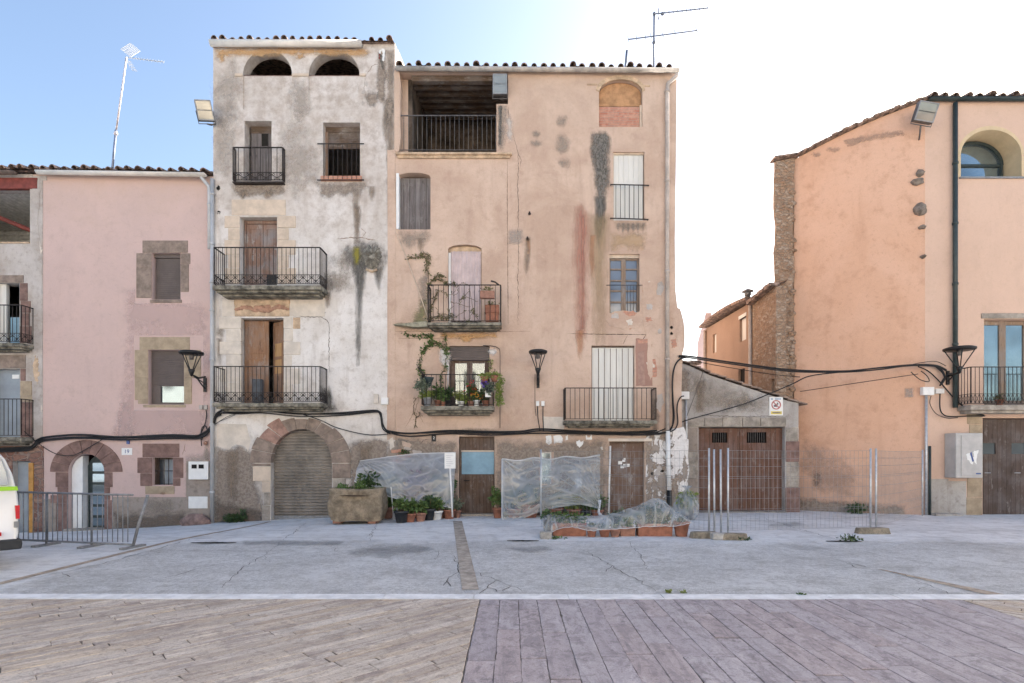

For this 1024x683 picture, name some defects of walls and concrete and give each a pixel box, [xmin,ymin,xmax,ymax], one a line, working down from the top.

water stain [320,183,386,350]
crack [396,108,522,339]
rust [576,209,587,331]
water stain [591,132,610,241]
flaking render [606,281,677,412]
water stain [206,447,263,523]
peeling [546,435,603,450]
peeling [645,427,690,516]